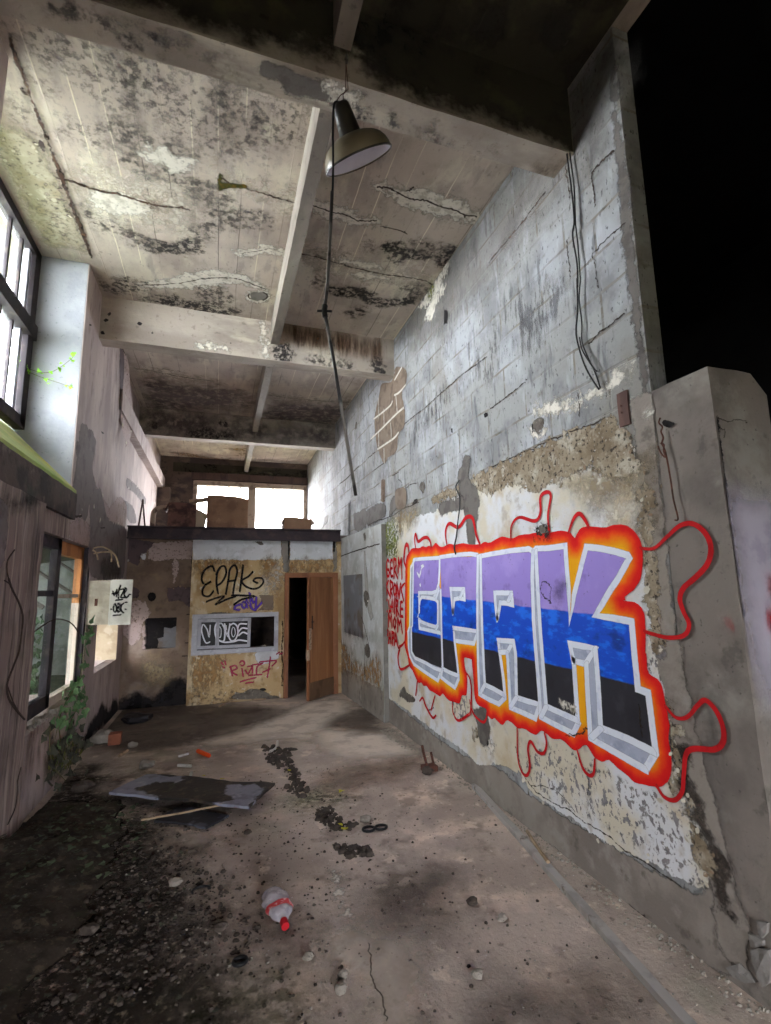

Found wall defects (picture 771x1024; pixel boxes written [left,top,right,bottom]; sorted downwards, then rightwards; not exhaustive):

crack [8,34,190,258]
water stain [0,29,302,255]
crack [217,174,481,234]
water stain [99,276,242,315]
water stain [313,241,456,322]
crack [566,222,626,288]
water stain [141,377,341,460]
peeling [127,539,154,566]
spalling [395,414,668,671]
spalling [167,586,191,607]
crack [368,943,388,1021]